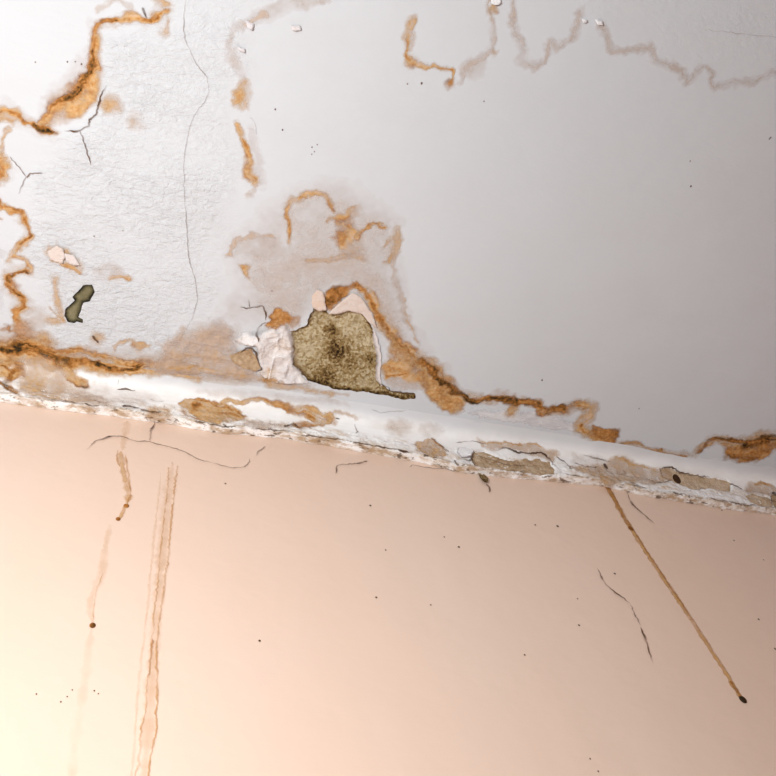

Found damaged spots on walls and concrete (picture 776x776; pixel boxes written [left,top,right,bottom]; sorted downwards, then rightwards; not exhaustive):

water stain [0,0,170,180]
spalling [64,285,95,323]
water stain [0,199,252,404]
spalling [230,290,416,400]
water stain [262,190,665,453]
crack [87,388,481,473]
peeling [457,441,557,492]
peeling [660,466,730,492]
water stain [697,432,776,463]
corrosion [606,487,689,616]
crack [598,570,652,657]
corrosion [697,630,747,703]